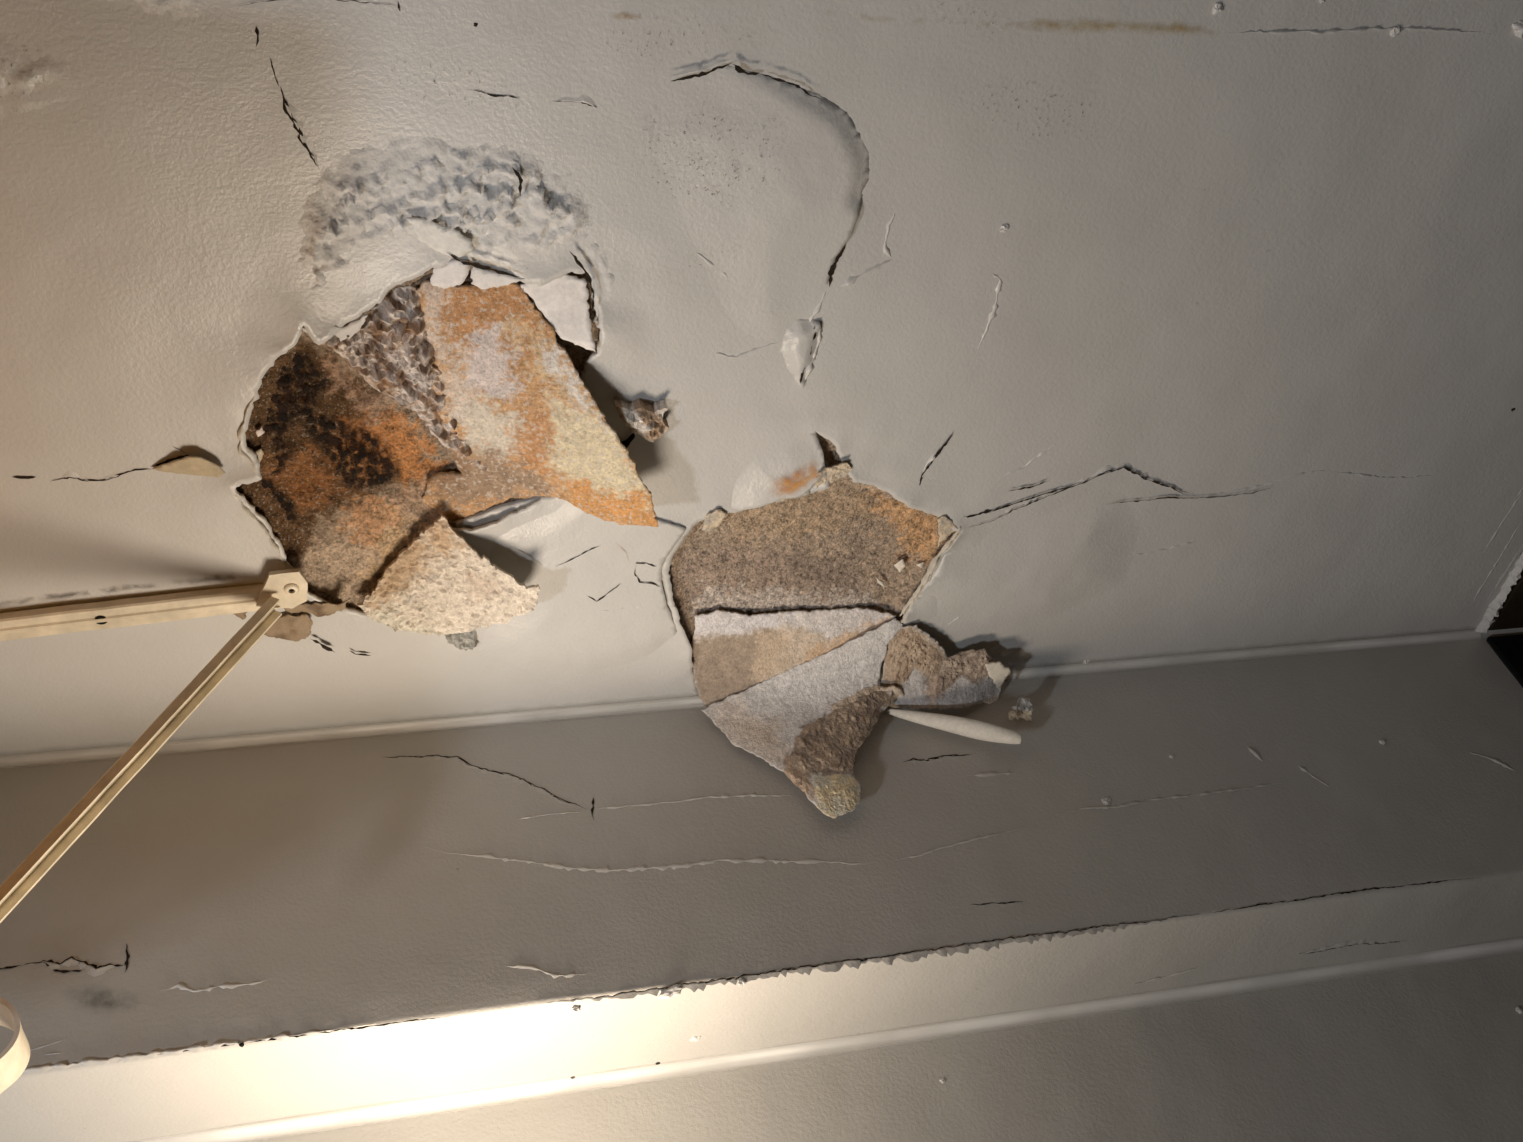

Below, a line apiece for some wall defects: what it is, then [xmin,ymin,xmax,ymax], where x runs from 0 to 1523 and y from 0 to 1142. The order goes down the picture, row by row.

crack [337,0,400,11]
crack [238,0,319,168]
crack [670,59,822,100]
crack [13,446,225,481]
flaking render [235,259,669,656]
crack [919,434,953,485]
crack [963,463,1430,528]
flaking render [669,432,1033,819]
crack [385,754,789,820]
crack [0,944,130,977]
crack [541,878,1474,1004]
crack [158,1015,452,1055]